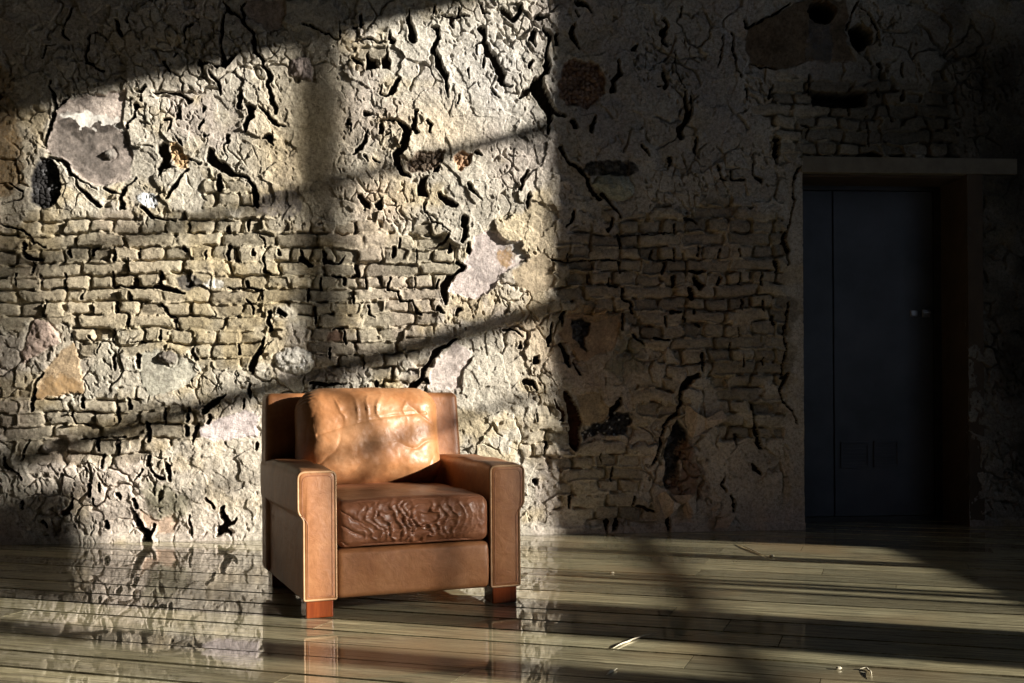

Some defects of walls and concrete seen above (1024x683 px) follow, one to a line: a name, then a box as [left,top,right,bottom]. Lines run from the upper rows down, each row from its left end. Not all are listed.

spalling [46,89,133,186]
crack [2,0,483,541]
spalling [448,231,555,299]
crack [302,0,904,482]
spalling [571,318,590,351]
spalling [36,343,84,400]
spalling [140,349,197,396]
spalling [428,343,472,390]
spalling [577,392,632,440]
flaking render [685,405,727,439]
crack [603,496,670,532]
crack [720,476,736,513]